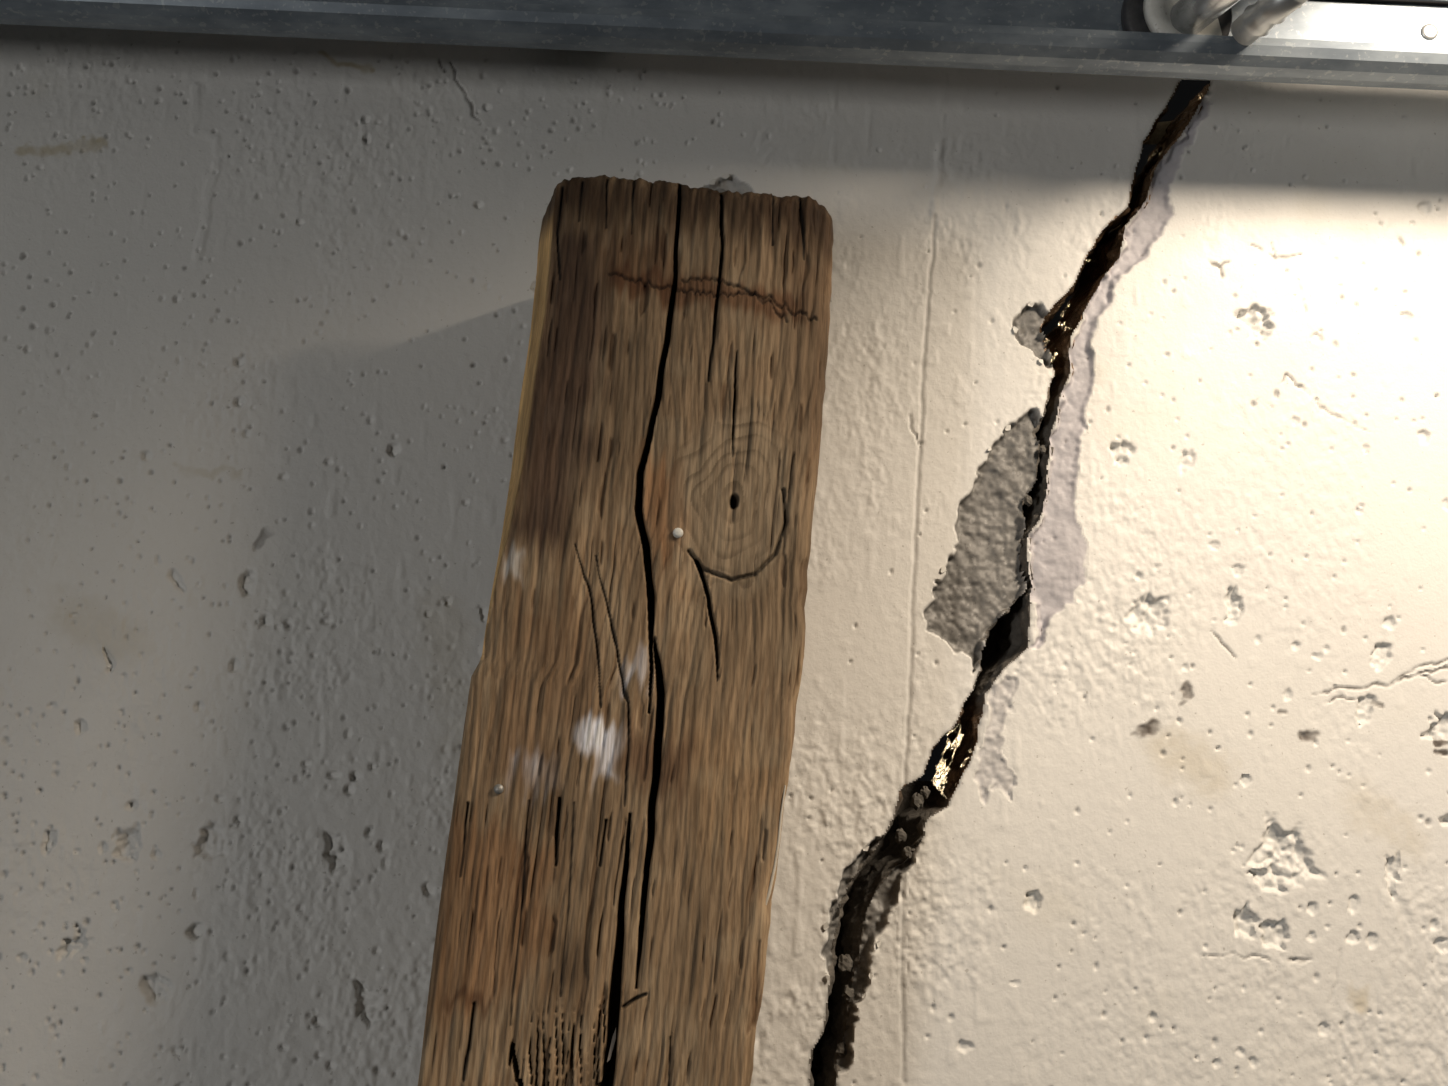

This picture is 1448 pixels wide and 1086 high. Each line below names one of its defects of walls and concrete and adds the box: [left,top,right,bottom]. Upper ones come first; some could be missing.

spalling [922,98,1215,677]
crack [808,81,1210,1086]
peeling [969,672,1020,809]
crack [1305,655,1448,707]
peeling [1227,774,1382,955]
spalling [1381,846,1405,912]